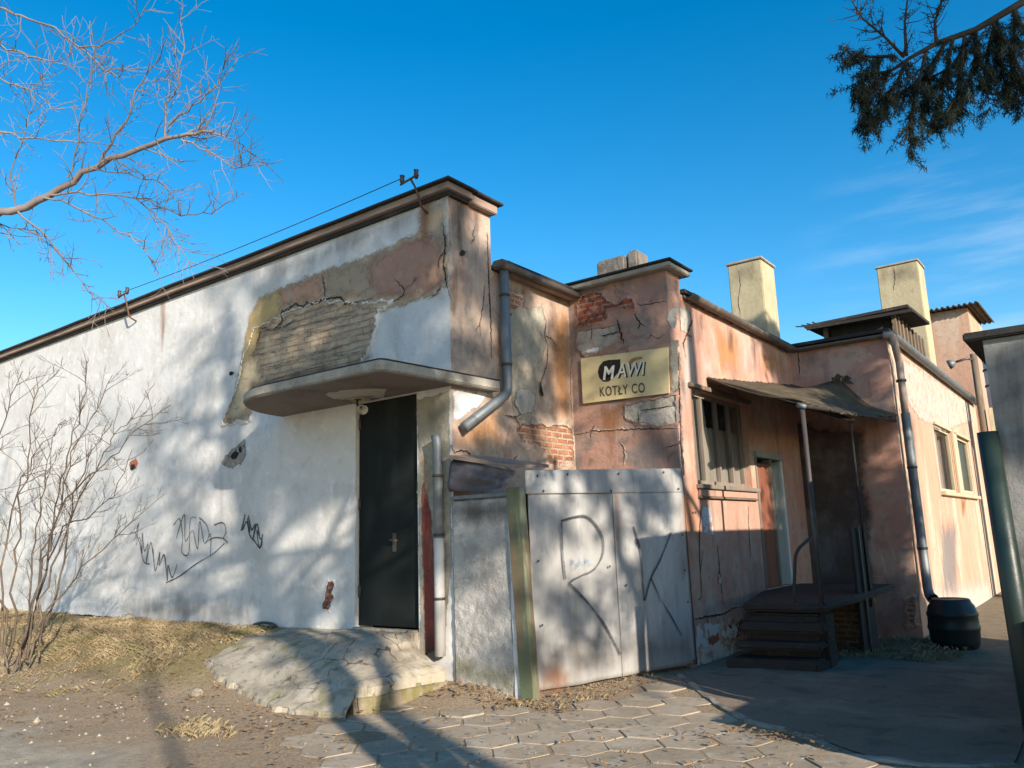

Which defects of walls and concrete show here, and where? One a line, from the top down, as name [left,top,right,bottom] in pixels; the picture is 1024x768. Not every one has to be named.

flaking render [221,199,466,429]
crack [255,215,493,358]
spalling [573,288,640,358]
crack [541,299,693,475]
flaking render [222,439,246,468]
spalling [511,418,576,470]
spalling [321,578,336,613]
peeling [696,622,739,666]